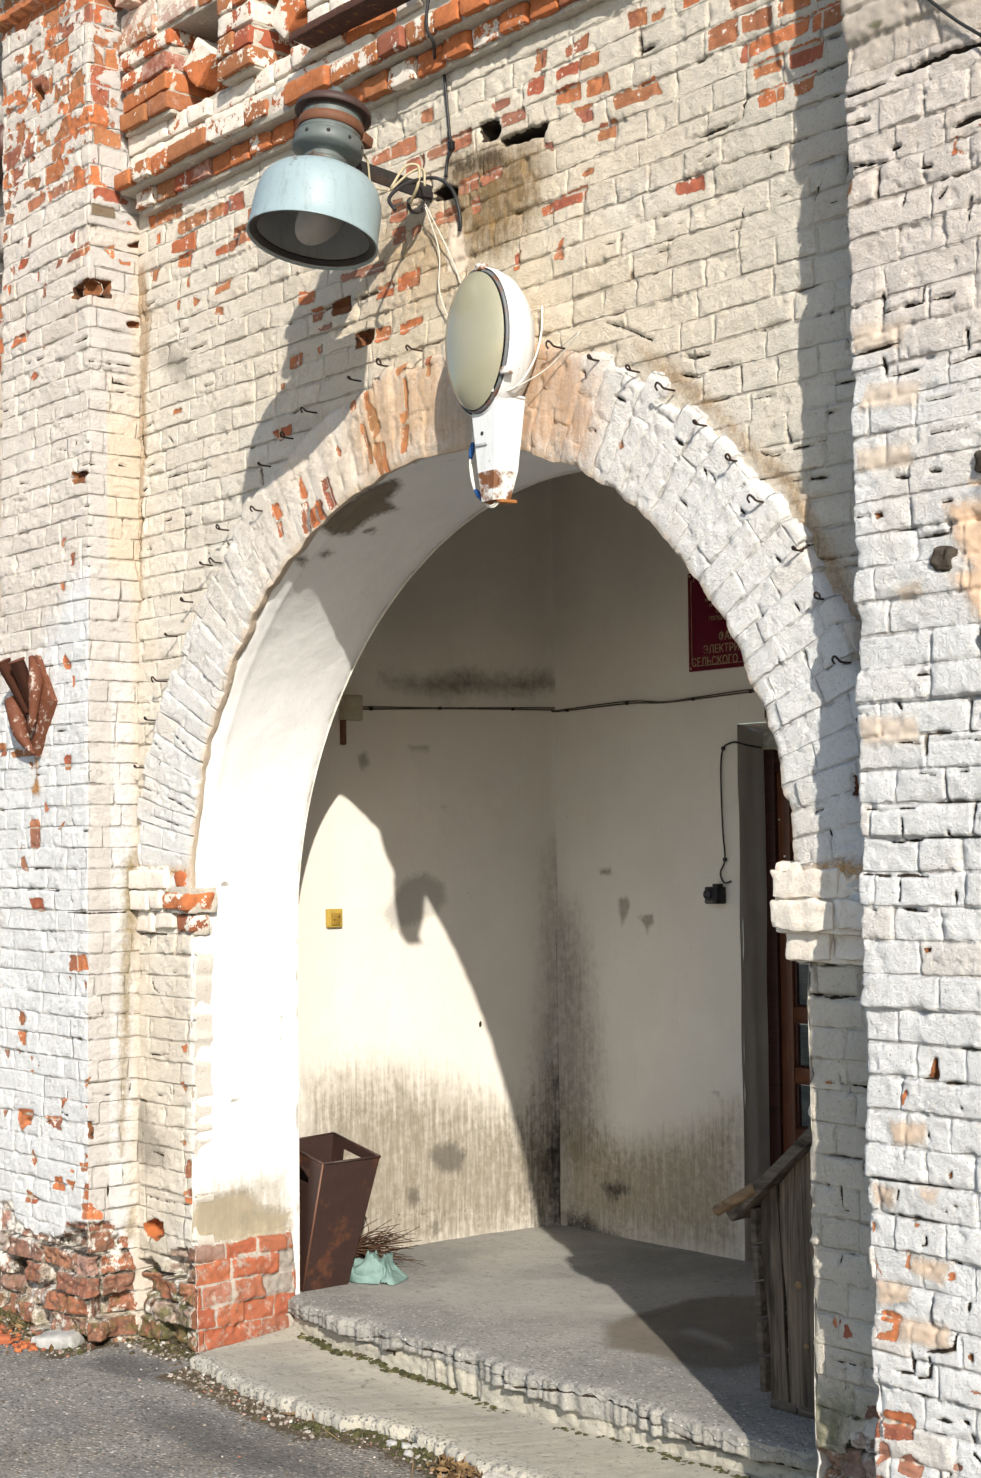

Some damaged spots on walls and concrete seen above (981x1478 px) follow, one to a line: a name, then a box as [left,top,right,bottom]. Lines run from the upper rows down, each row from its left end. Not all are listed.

peeling [0,0,251,372]
damp [454,147,540,247]
peeling [4,1011,39,1074]
spalling [0,1077,296,1353]
damp [316,1091,729,1241]
crack [288,1308,811,1472]
spalling [817,1406,924,1478]